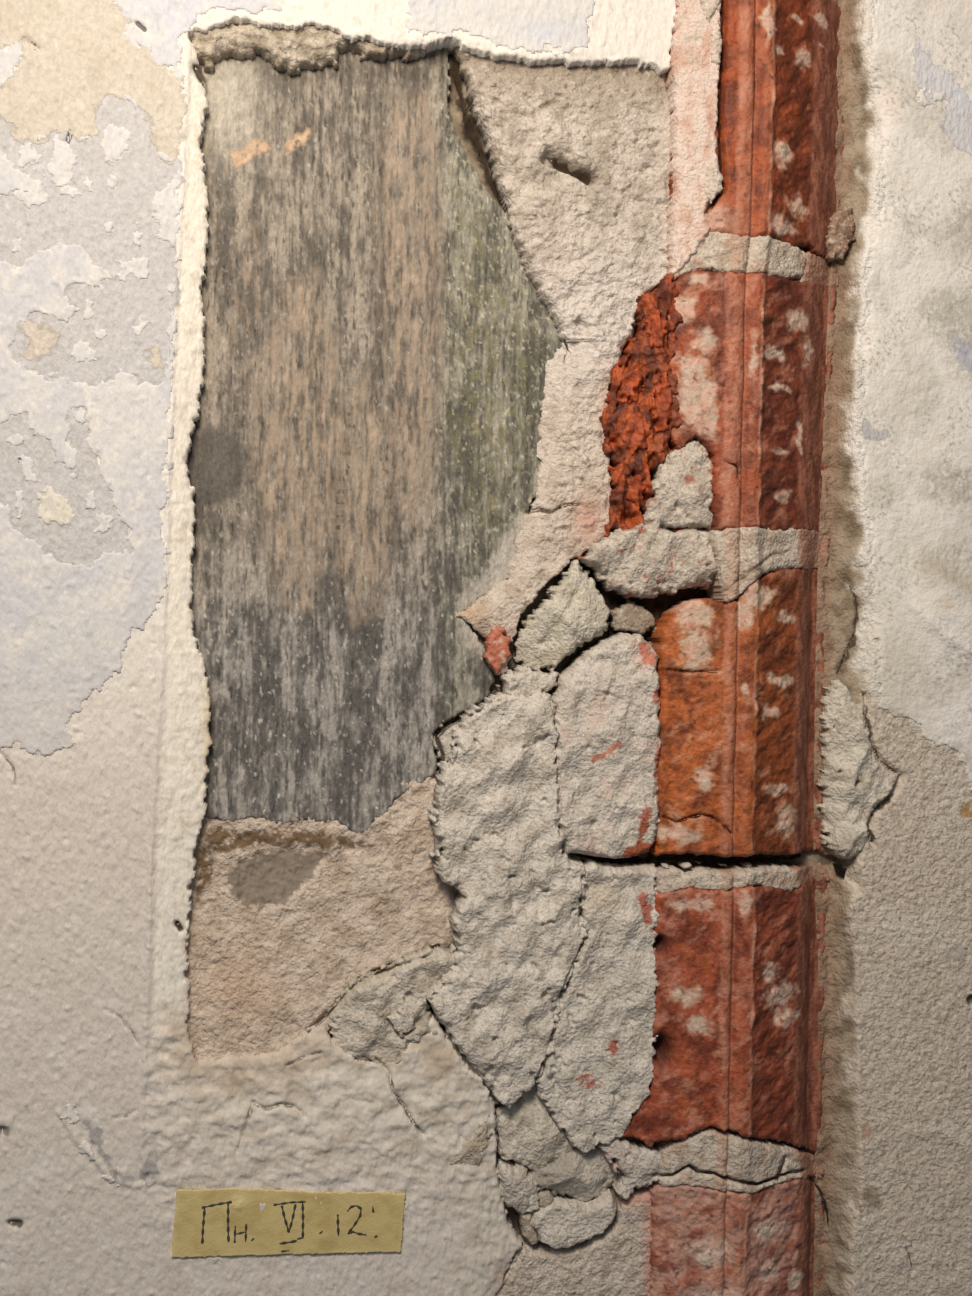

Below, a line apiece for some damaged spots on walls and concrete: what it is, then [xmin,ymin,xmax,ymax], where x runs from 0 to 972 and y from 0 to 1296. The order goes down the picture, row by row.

spalling [825,206,857,264]
crack [528,503,579,514]
crack [662,526,708,534]
peeling [0,0,723,1166]
crack [730,552,786,590]
crack [837,572,858,674]
crack [435,714,466,774]
crack [569,814,801,865]
crack [833,863,847,879]
peeling [60,1103,158,1188]
crack [657,1159,829,1227]